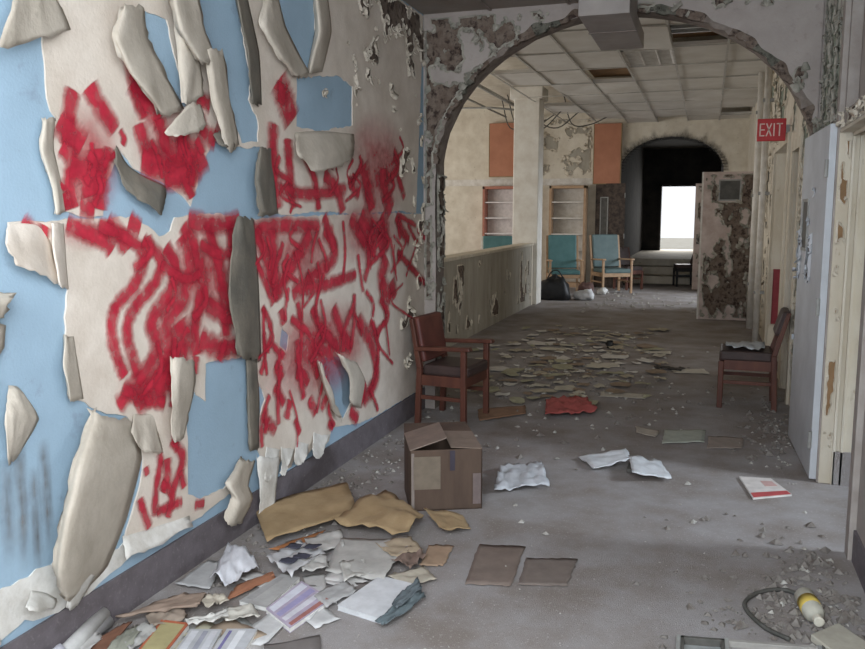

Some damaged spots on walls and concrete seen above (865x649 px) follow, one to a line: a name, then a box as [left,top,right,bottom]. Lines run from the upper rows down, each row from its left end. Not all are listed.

peeling [0,0,580,645]
peeling [543,118,593,177]
peeling [637,0,865,374]
peeling [824,359,837,417]